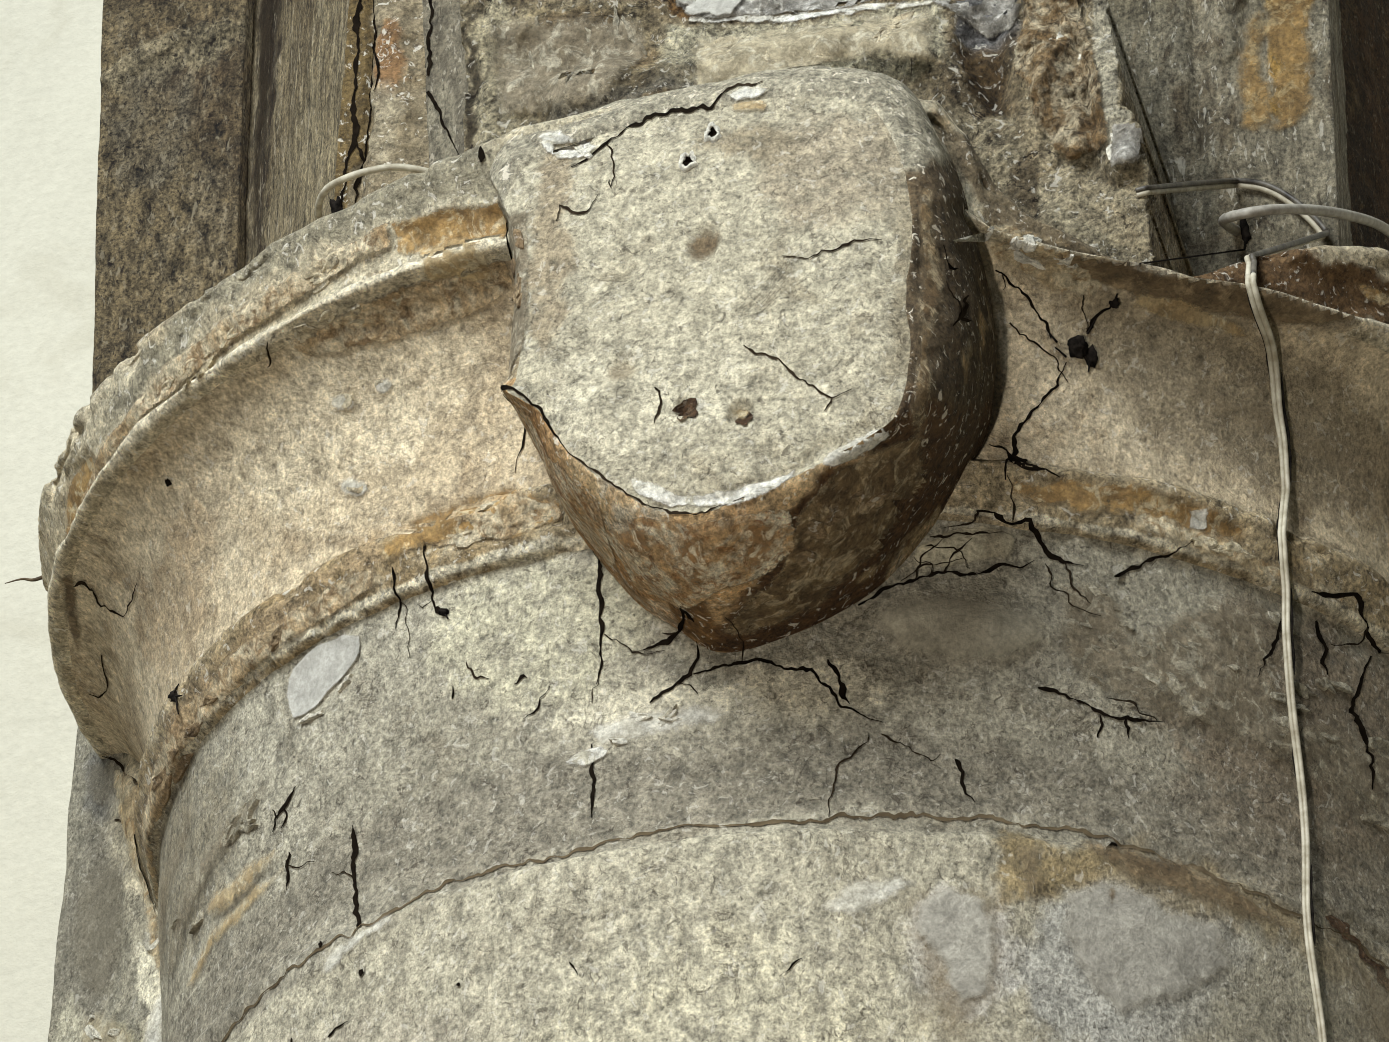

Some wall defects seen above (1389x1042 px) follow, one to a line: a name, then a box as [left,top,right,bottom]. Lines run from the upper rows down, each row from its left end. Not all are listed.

crack [425,0,459,155]
corrosion [1237,0,1313,129]
crack [556,81,763,221]
crack [943,245,972,326]
flaking render [953,225,1102,296]
flaking render [632,471,793,507]
spalling [726,190,944,635]
crack [858,270,1193,616]
crack [74,581,137,617]
crack [89,655,108,698]
crack [221,542,1389,1042]